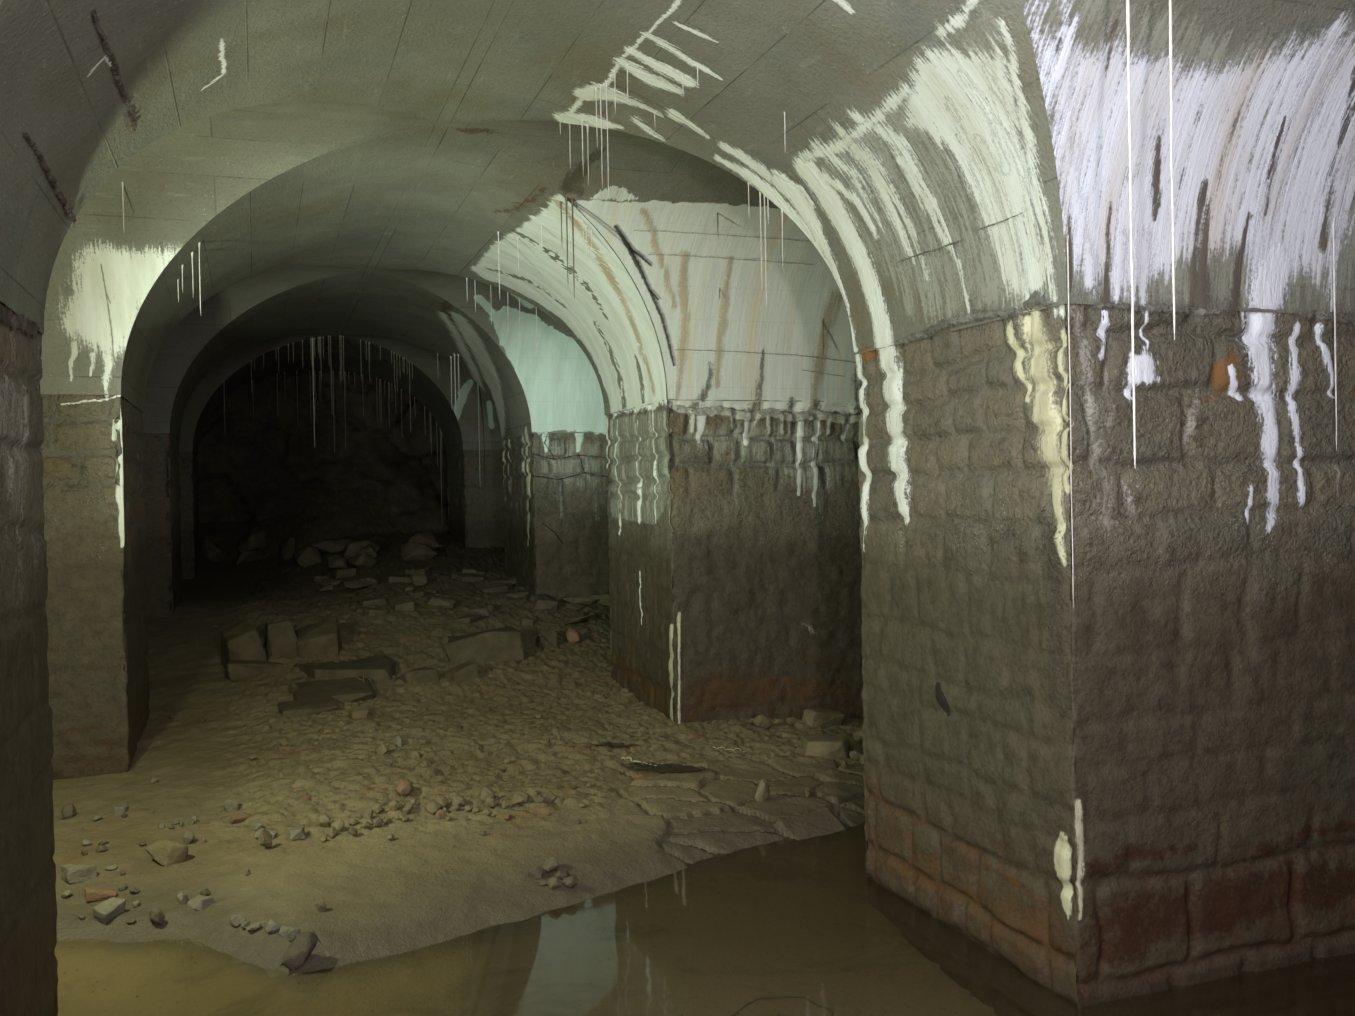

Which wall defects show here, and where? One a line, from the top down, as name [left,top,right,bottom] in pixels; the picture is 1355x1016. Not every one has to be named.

water stain [0,365,31,540]
water stain [59,239,181,548]
corrosion [642,211,688,401]
corrosion [715,259,732,387]
crack [614,225,856,377]
water stain [438,0,1355,566]
corrosion [1206,349,1242,401]
water stain [668,612,681,724]
water stain [1054,799,1084,920]